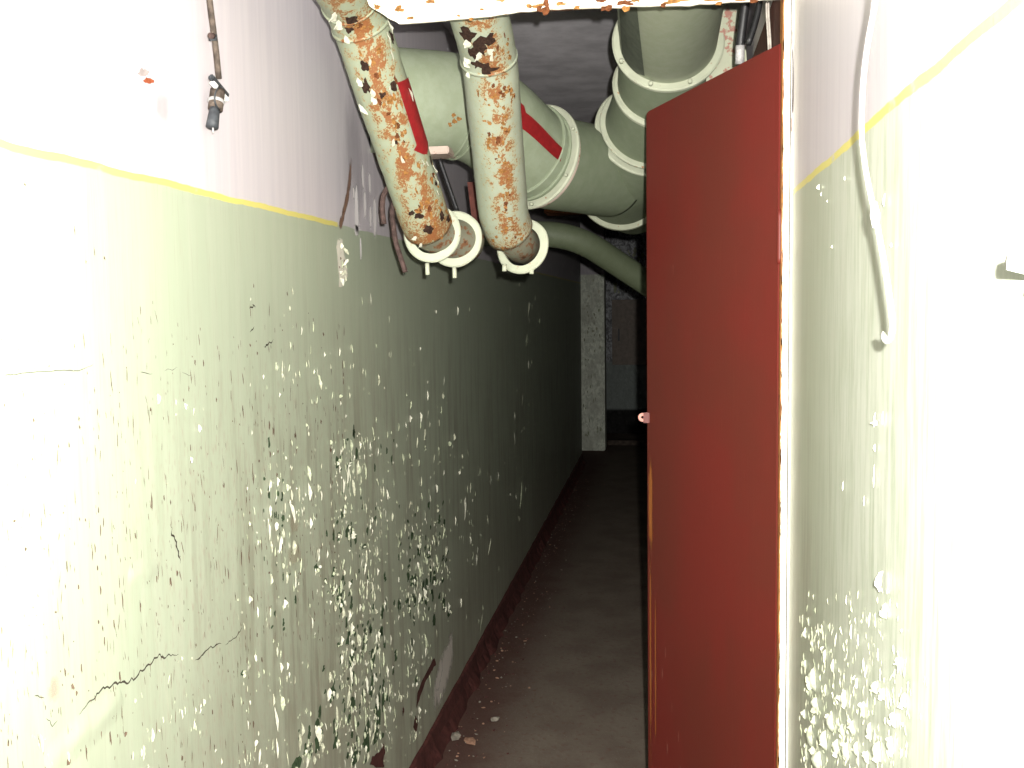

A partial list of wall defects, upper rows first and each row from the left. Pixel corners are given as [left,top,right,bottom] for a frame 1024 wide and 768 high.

corrosion [526,0,566,8]
peeling [237,345,491,768]
crack [35,628,242,727]
peeling [799,571,921,768]